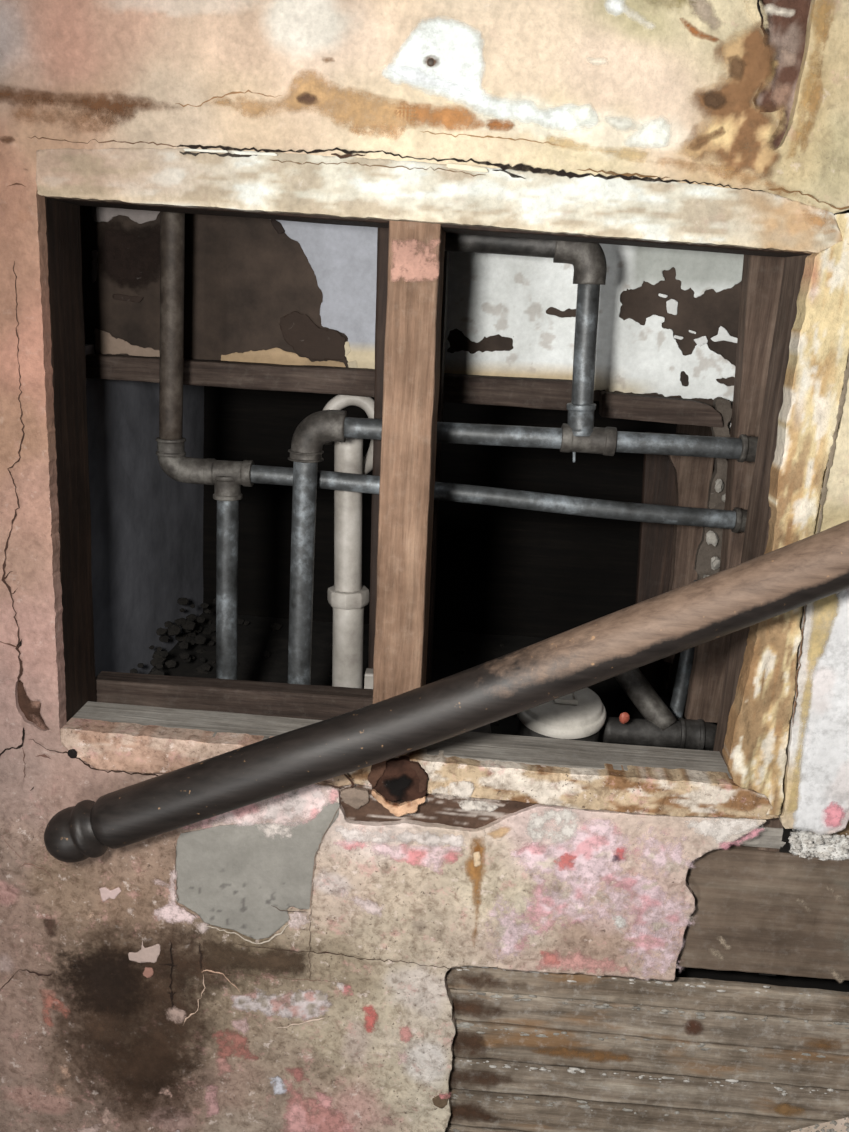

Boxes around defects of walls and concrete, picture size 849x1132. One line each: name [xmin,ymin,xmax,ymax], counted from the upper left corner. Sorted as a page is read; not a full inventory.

crack [29,136,849,210]
rust [397,104,577,148]
peeling [383,19,669,147]
rust [606,149,646,160]
flaking render [684,0,811,177]
crack [0,261,25,682]
crack [816,355,849,533]
peeling [779,588,849,853]
leakage [44,919,56,935]
flaking render [154,781,763,976]
rust [466,828,509,904]
leakage [51,929,303,1117]